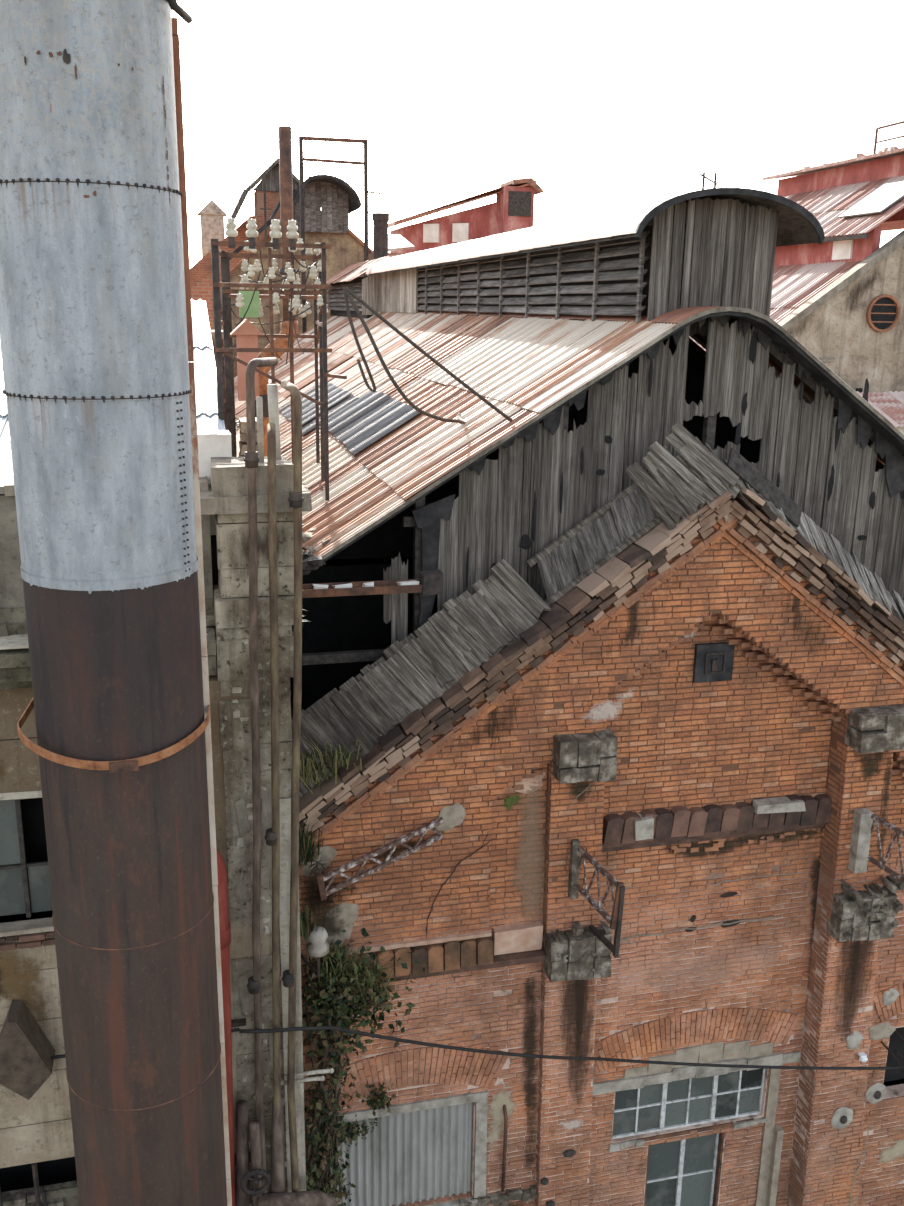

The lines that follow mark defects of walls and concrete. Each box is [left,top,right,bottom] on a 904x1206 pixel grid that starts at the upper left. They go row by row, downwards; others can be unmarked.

crack [426,831,491,938]
damp [564,980,593,1093]
damp [839,940,873,1033]